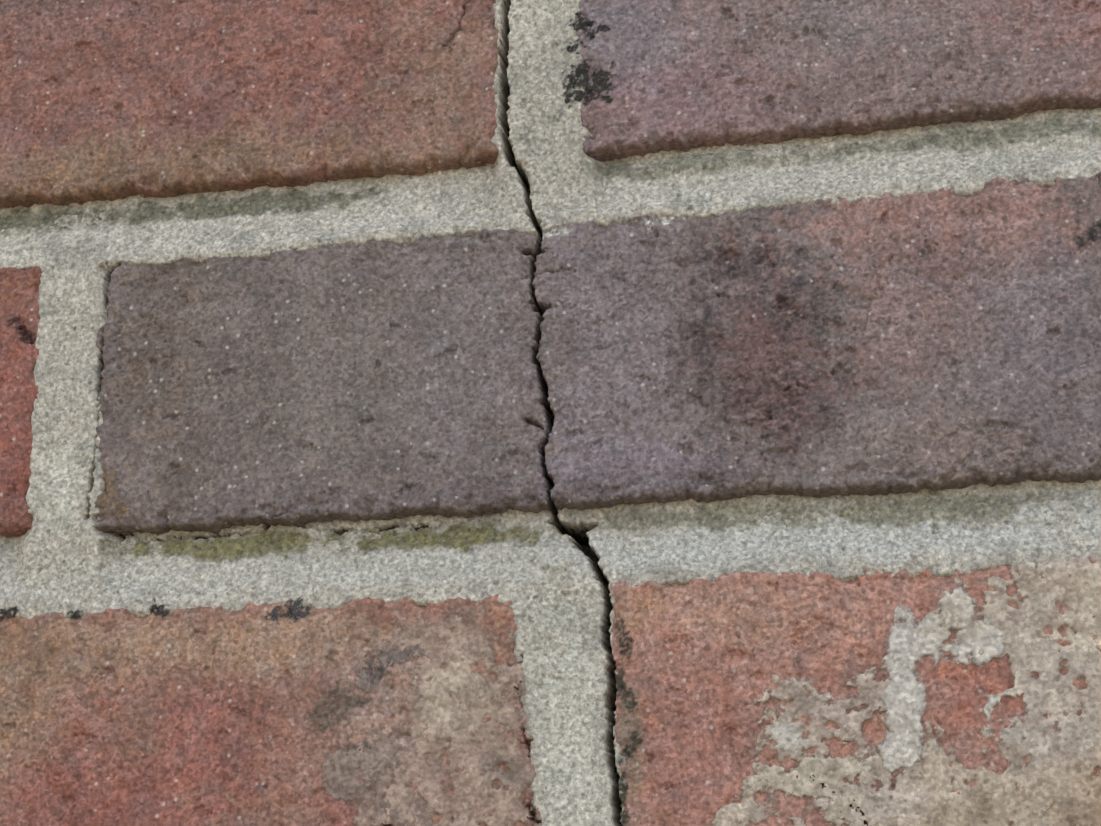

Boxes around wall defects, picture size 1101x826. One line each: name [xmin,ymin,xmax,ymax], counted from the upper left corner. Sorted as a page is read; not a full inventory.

crack [505,91,576,313]
crack [527,369,554,430]
crack [552,484,609,587]
peeling [711,556,1101,826]
crack [529,806,541,823]